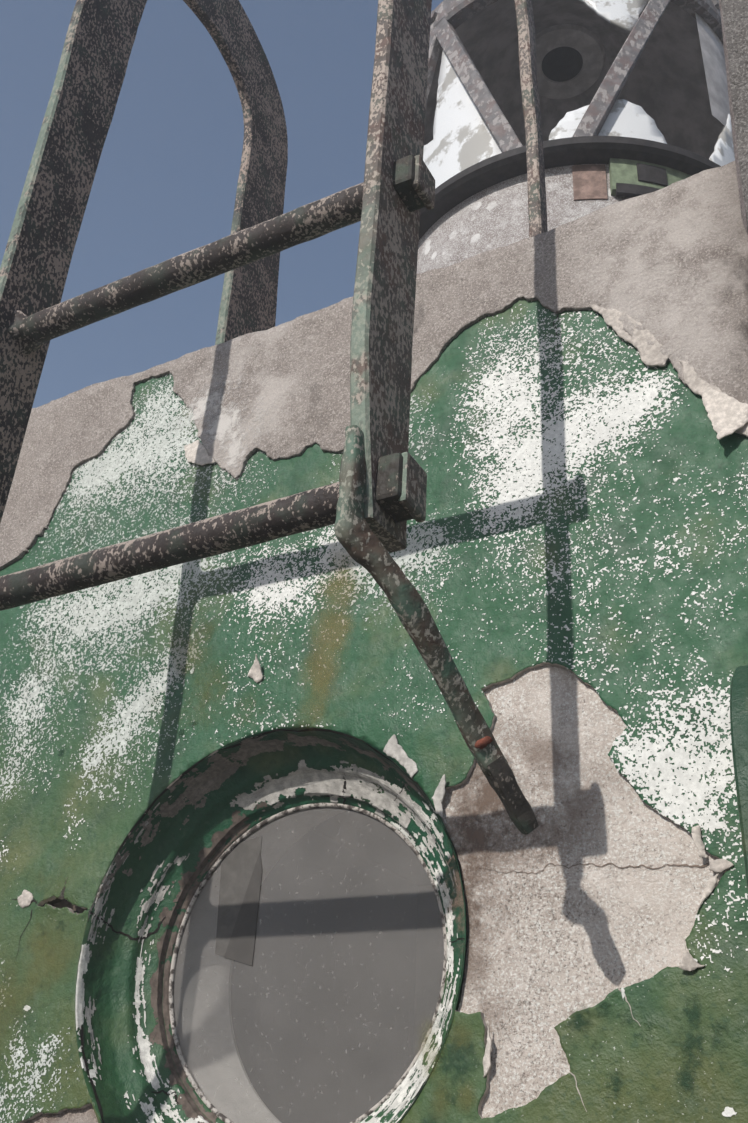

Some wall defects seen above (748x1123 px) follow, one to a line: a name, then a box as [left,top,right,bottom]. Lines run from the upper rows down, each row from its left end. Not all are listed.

peeling [0,297,353,570]
damp [189,381,266,466]
peeling [0,524,396,849]
peeling [128,161,748,1123]
peeling [0,848,133,1123]
crack [80,1025,104,1123]
crack [12,728,708,999]
crack [401,937,465,1119]